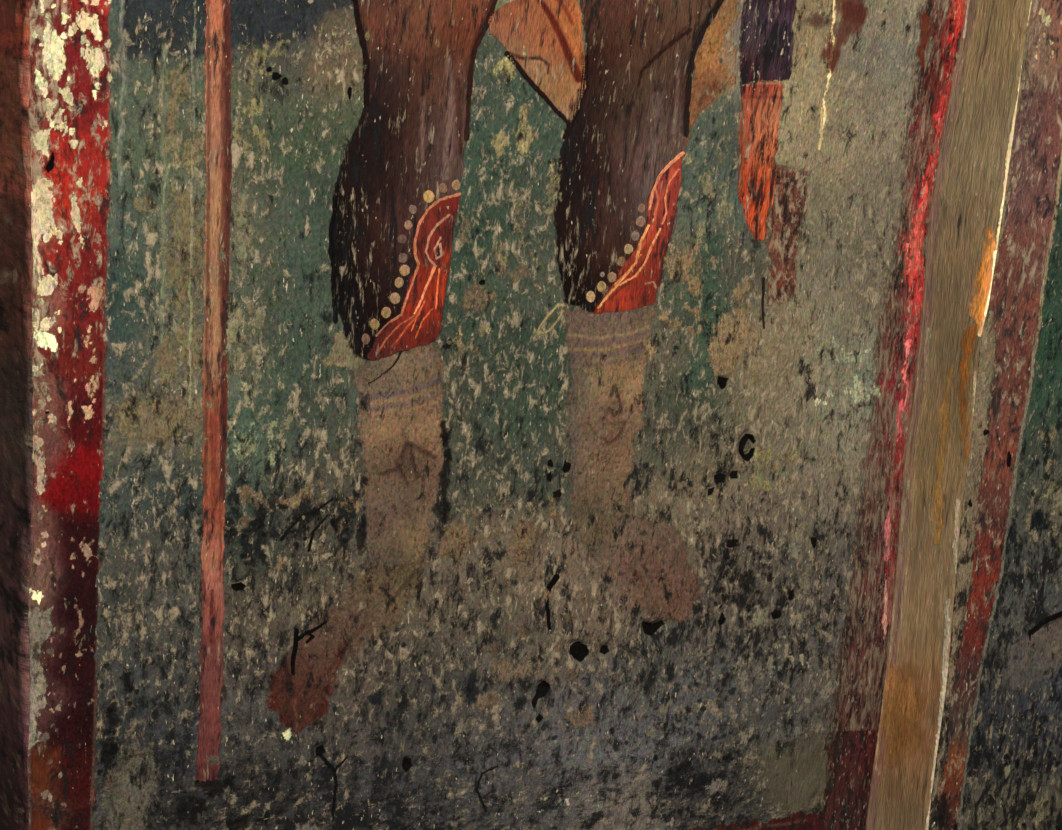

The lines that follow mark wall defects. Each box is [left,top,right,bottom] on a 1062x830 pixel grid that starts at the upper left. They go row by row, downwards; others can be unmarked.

peeling [32,183,213,577]